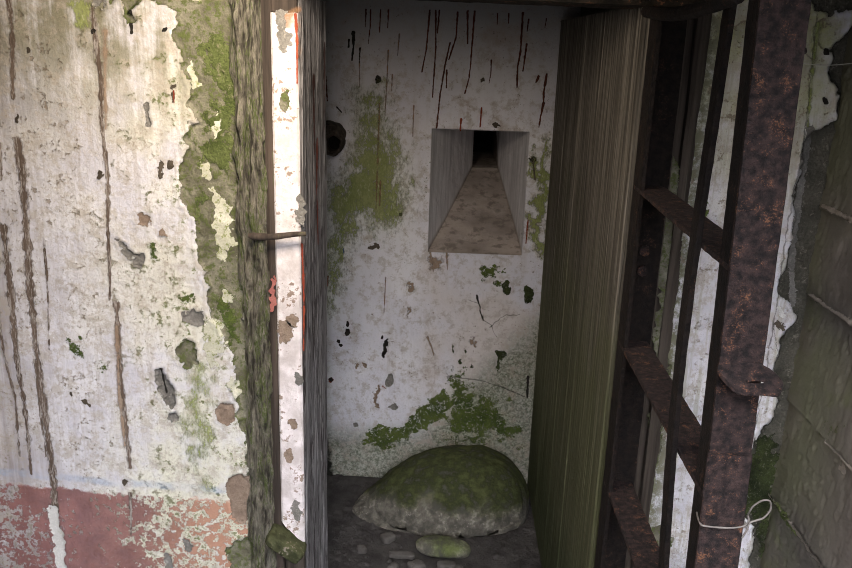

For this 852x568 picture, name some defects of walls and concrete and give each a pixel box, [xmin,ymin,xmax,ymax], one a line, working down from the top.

corrosion [421,10,476,129]
corrosion [516,12,530,88]
corrosion [535,73,548,126]
flaking render [812,0,852,17]
flaking render [92,0,250,524]
flaking render [751,28,851,471]
flaking render [224,537,252,568]
flaking render [745,485,772,568]